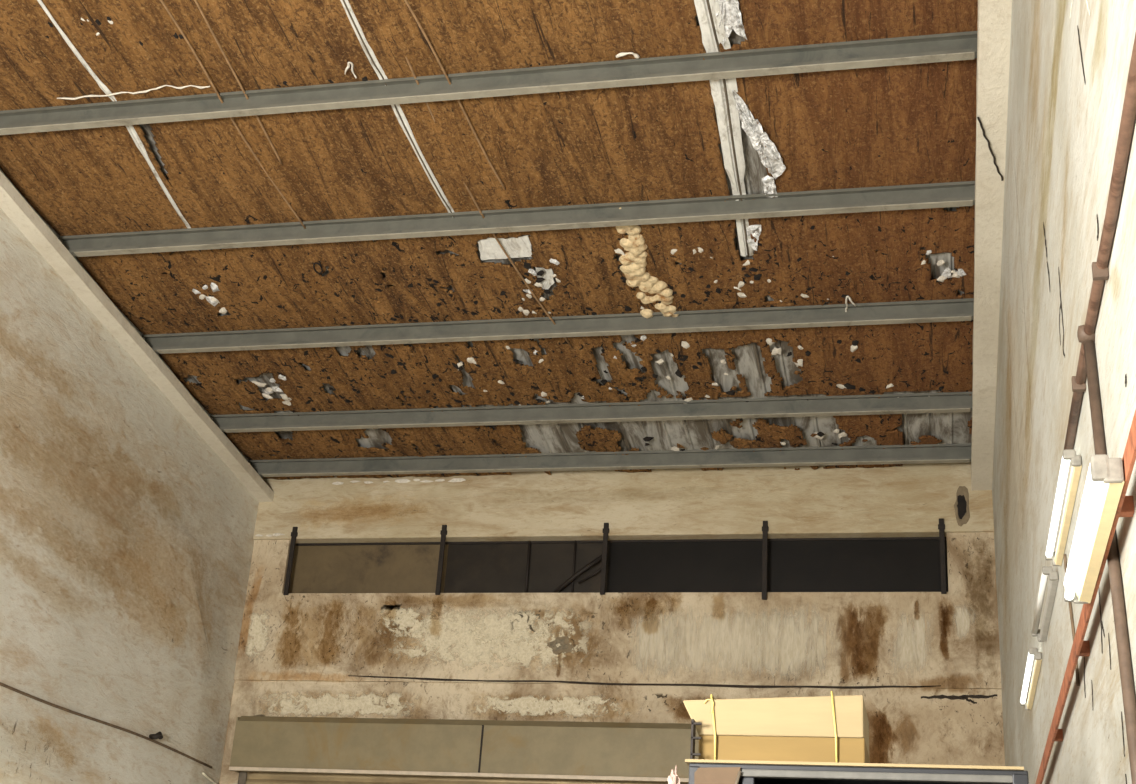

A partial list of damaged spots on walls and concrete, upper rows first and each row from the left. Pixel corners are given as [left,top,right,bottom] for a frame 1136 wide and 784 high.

crack [1070,0,1090,82]
peeling [515,258,568,317]
crack [1043,222,1065,357]
peeling [591,341,749,404]
peeling [766,338,811,390]
peeling [836,372,894,394]
peeling [810,429,847,445]
damp [246,613,269,661]
damp [383,608,588,668]
damp [636,610,826,674]
damp [263,693,417,716]
damp [471,696,629,717]